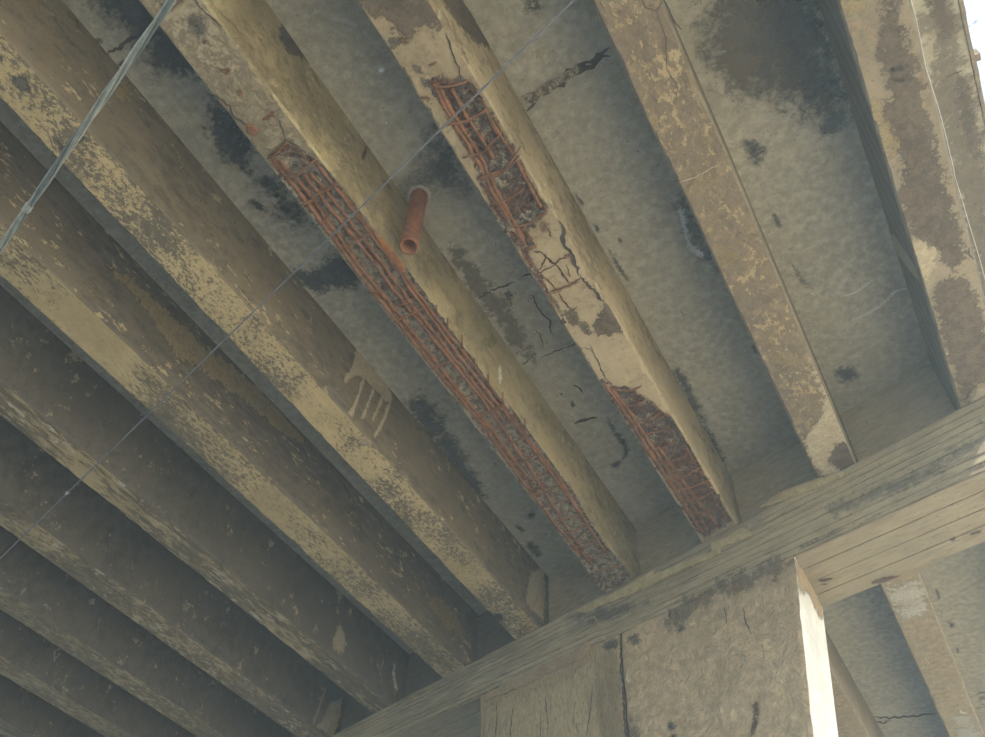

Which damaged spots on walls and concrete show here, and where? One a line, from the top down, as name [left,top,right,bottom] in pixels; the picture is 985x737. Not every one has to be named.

leakage [87,0,200,79]
leakage [188,14,210,36]
crack [523,47,611,116]
leakage [693,0,848,134]
leakage [204,100,309,230]
spalling [426,75,566,324]
leakage [875,0,985,402]
crack [528,221,605,349]
spalling [267,139,631,591]
spalling [600,379,732,538]